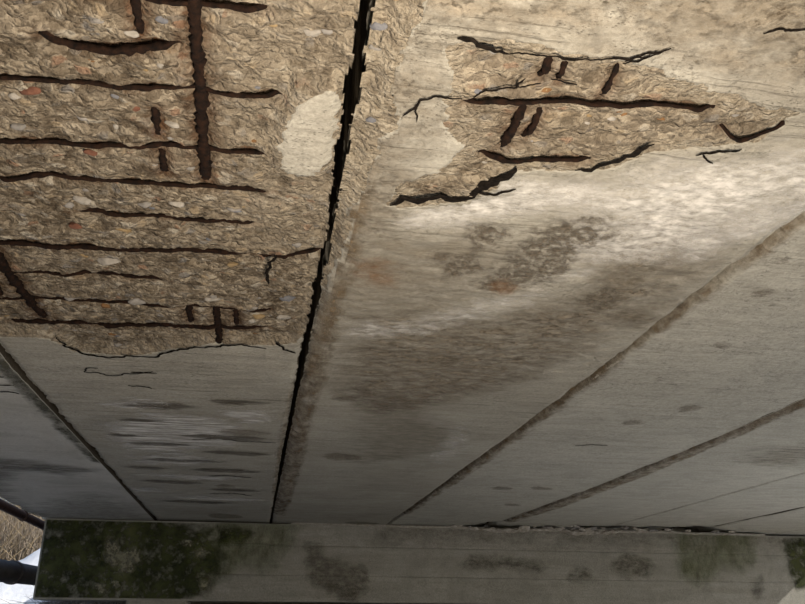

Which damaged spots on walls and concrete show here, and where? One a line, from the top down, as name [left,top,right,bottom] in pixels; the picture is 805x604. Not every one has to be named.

spalling [386,38,800,208]
spalling [0,0,426,356]
leakage [409,159,805,258]
crack [265,253,278,284]
leakage [111,399,267,491]